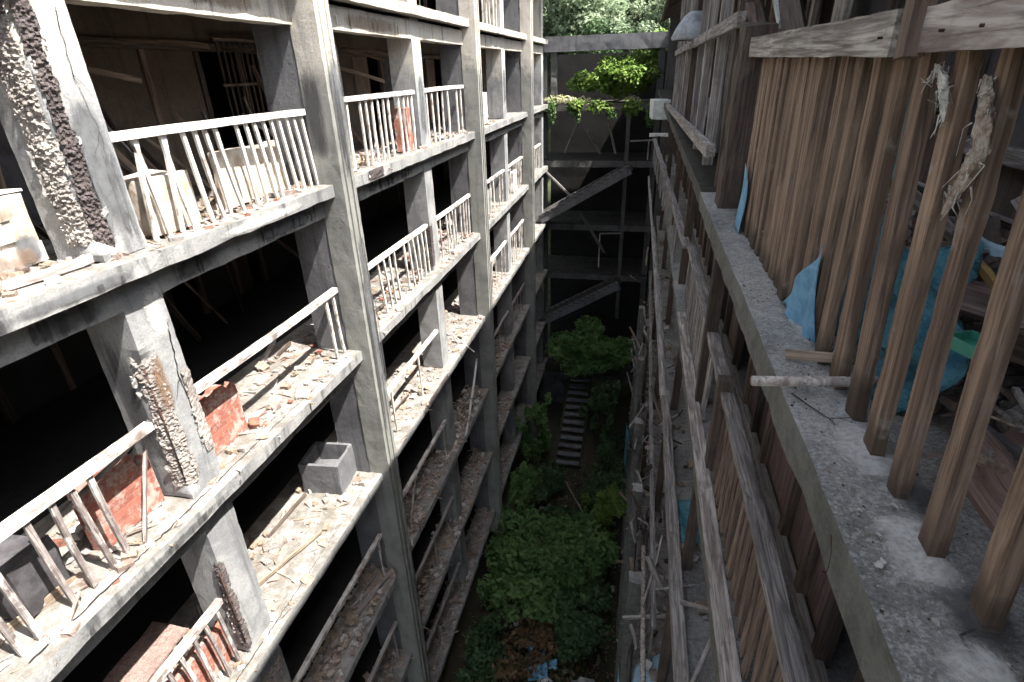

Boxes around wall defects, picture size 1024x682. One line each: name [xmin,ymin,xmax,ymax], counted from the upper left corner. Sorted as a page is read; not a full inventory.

spalling [0,0,116,249]
spalling [129,354,214,490]
spalling [213,561,252,648]
water stain [943,589,1013,643]